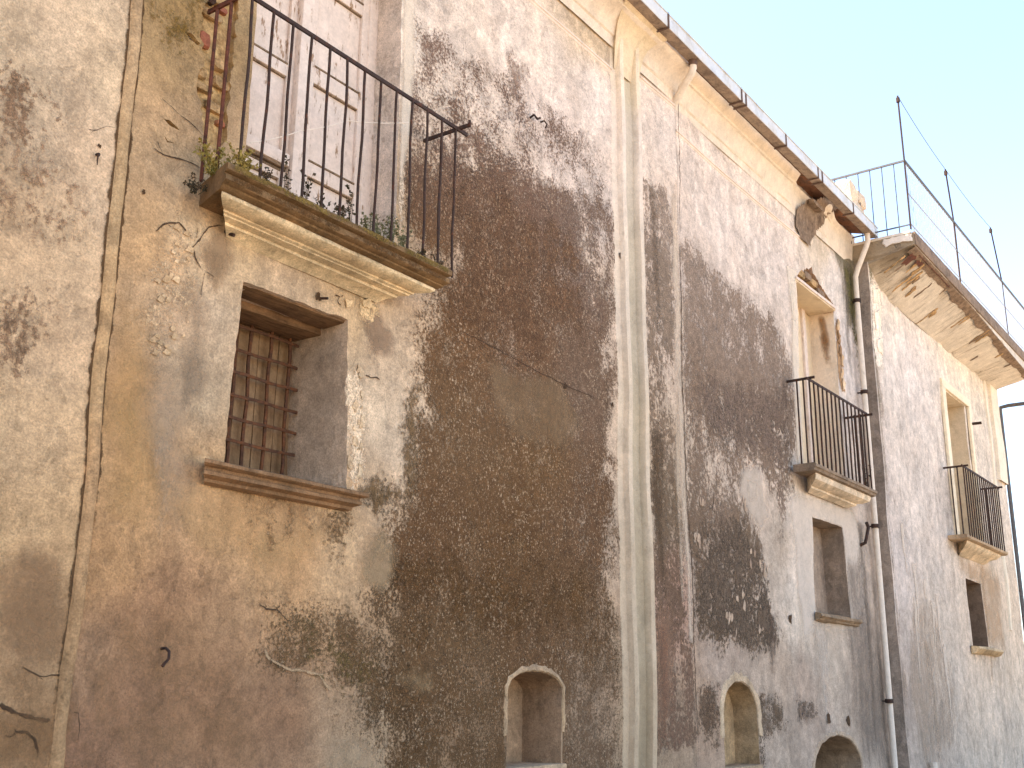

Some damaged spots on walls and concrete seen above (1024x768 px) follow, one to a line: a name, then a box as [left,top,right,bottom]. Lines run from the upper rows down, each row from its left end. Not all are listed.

crack [0,0,198,753]
peeling [144,213,202,356]
crack [156,222,220,292]
damp [232,18,624,768]
damp [643,178,796,755]
spalling [870,233,1024,378]